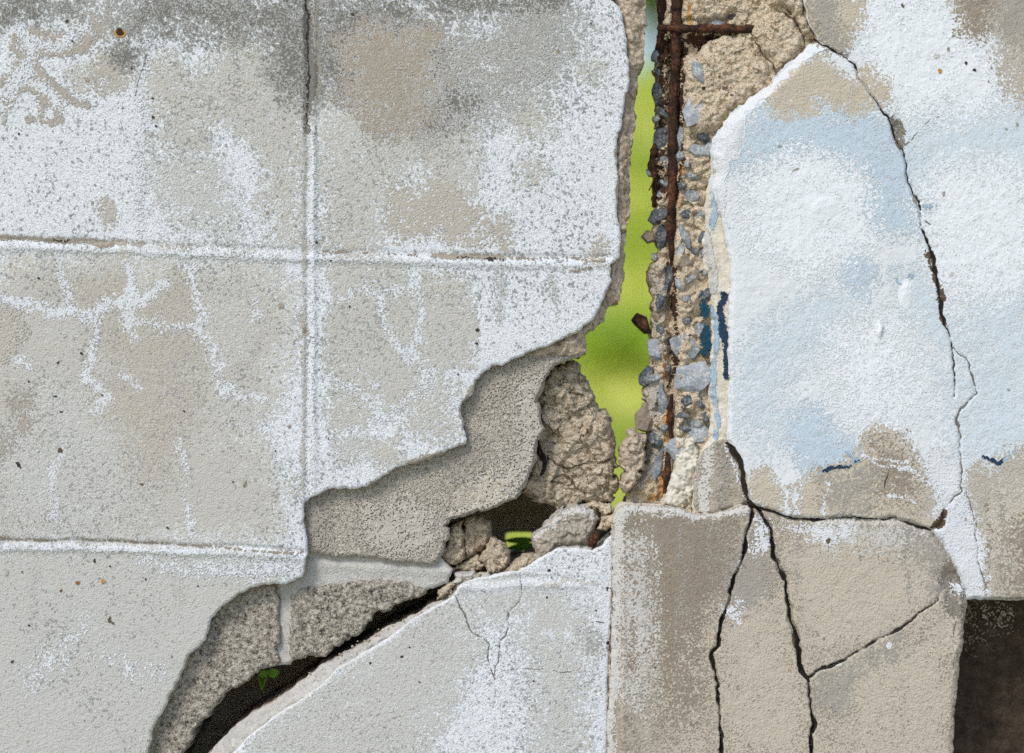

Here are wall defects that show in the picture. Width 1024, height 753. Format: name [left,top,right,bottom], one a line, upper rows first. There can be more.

corrosion [656,3,736,207]
damp [0,380,44,466]
peeling [0,0,615,753]
corrosion [649,409,668,502]
corrosion [662,261,680,388]
spalling [622,0,906,504]
crack [709,11,985,753]
crack [454,566,613,709]